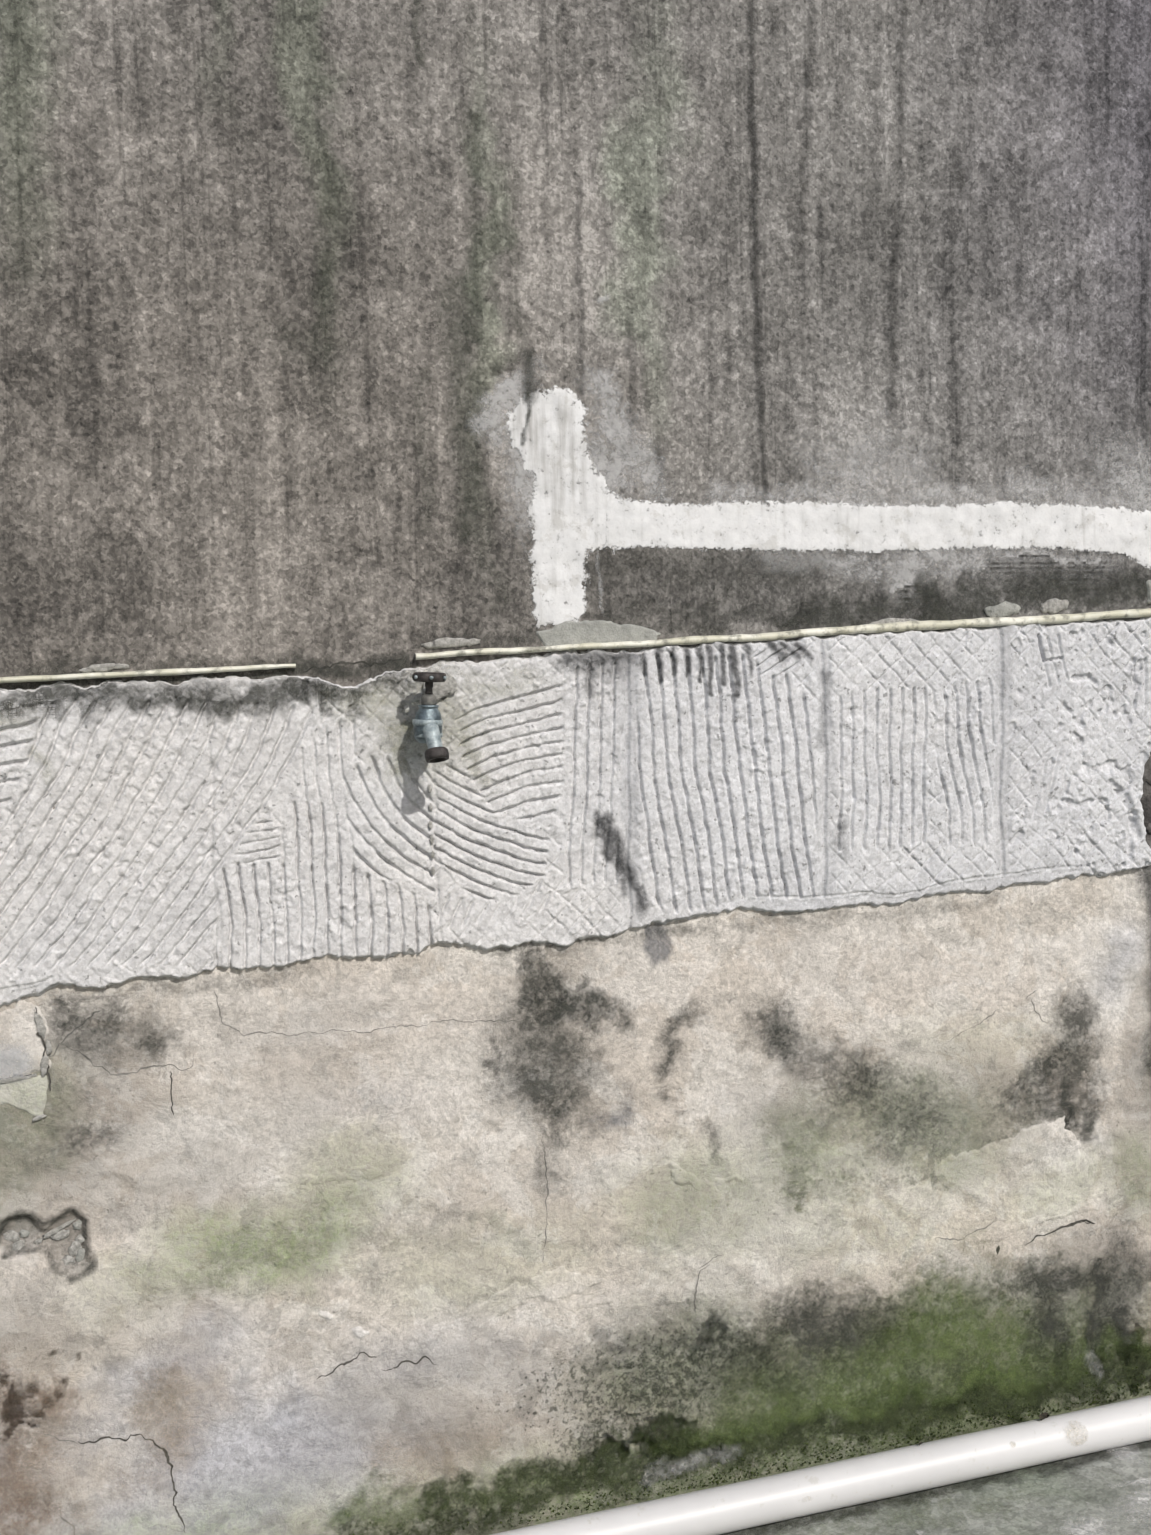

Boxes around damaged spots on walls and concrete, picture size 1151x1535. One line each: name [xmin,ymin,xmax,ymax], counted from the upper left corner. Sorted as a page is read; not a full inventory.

damp [564,611,752,697]
damp [768,572,1148,659]
damp [597,816,646,909]
flaking render [0,1000,52,1122]
crack [214,991,522,1036]
damp [503,967,632,1119]
damp [1025,995,1099,1139]
spalling [0,1210,95,1280]
crack [938,1219,1095,1254]
crack [317,1352,436,1379]
damp [336,1241,1151,1527]
crack [44,1433,185,1532]